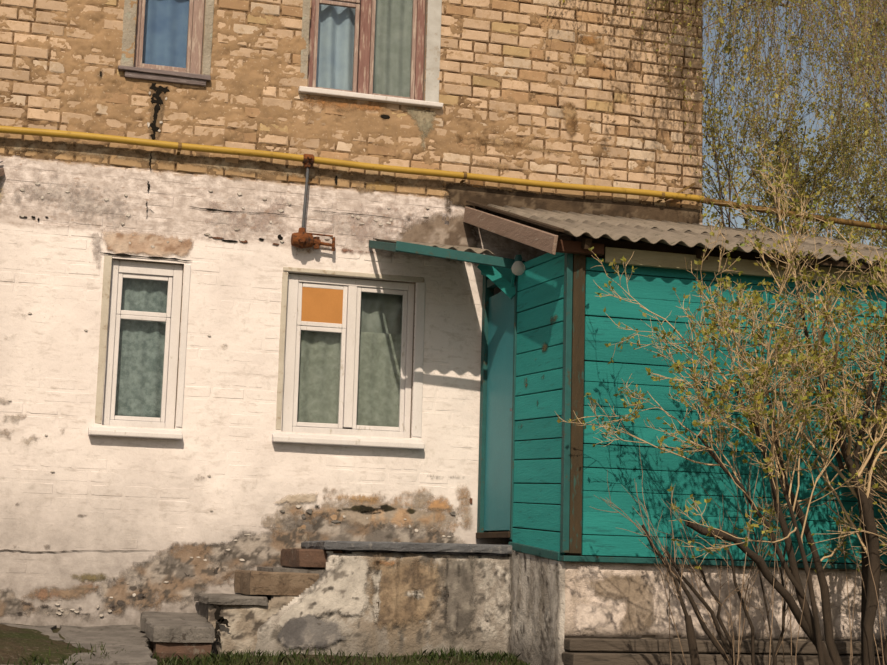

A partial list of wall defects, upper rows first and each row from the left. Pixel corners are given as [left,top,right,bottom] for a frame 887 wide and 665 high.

spalling [562,102,578,137]
spalling [0,177,192,268]
peeling [204,190,291,245]
crack [0,545,154,553]
spalling [0,488,472,649]
peeling [576,566,600,578]
peeling [574,603,614,630]
peeling [657,588,680,628]